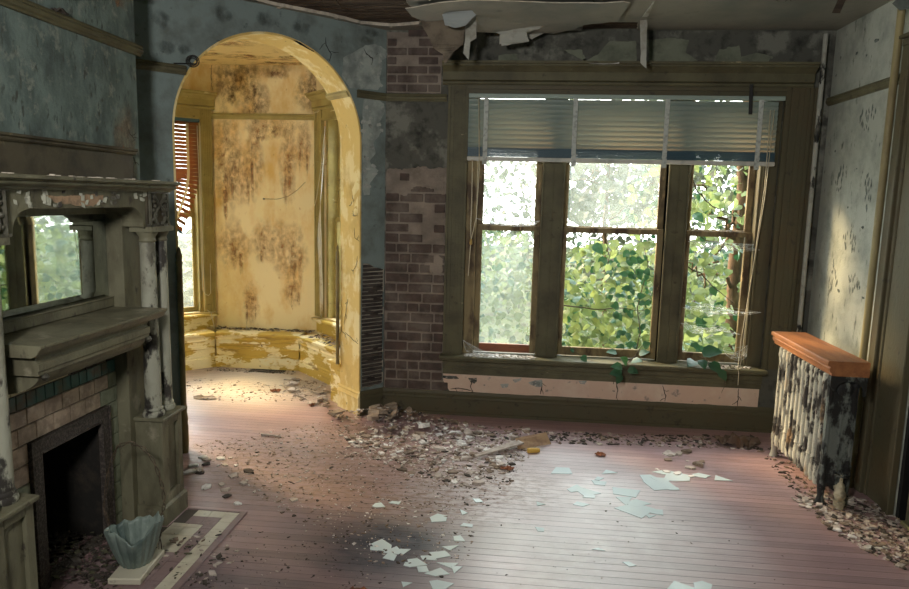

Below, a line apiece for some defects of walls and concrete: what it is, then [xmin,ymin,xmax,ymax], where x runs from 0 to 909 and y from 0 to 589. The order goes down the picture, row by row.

peeling [214,340,297,367]
flaking render [340,30,477,391]